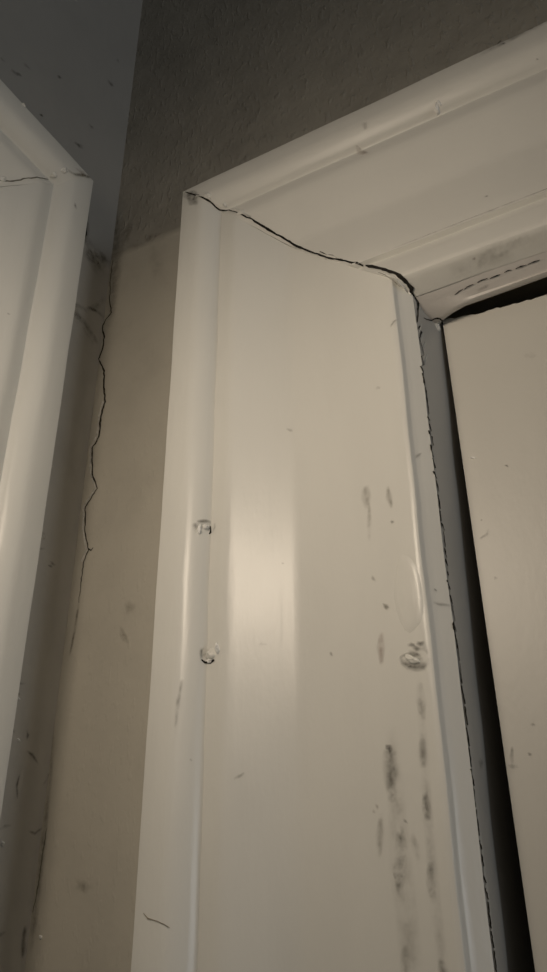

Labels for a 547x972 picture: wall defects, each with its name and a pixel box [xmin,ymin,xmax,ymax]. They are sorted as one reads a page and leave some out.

crack [0,167,67,182]
crack [76,262,113,617]
crack [186,192,497,972]
crack [455,260,539,295]